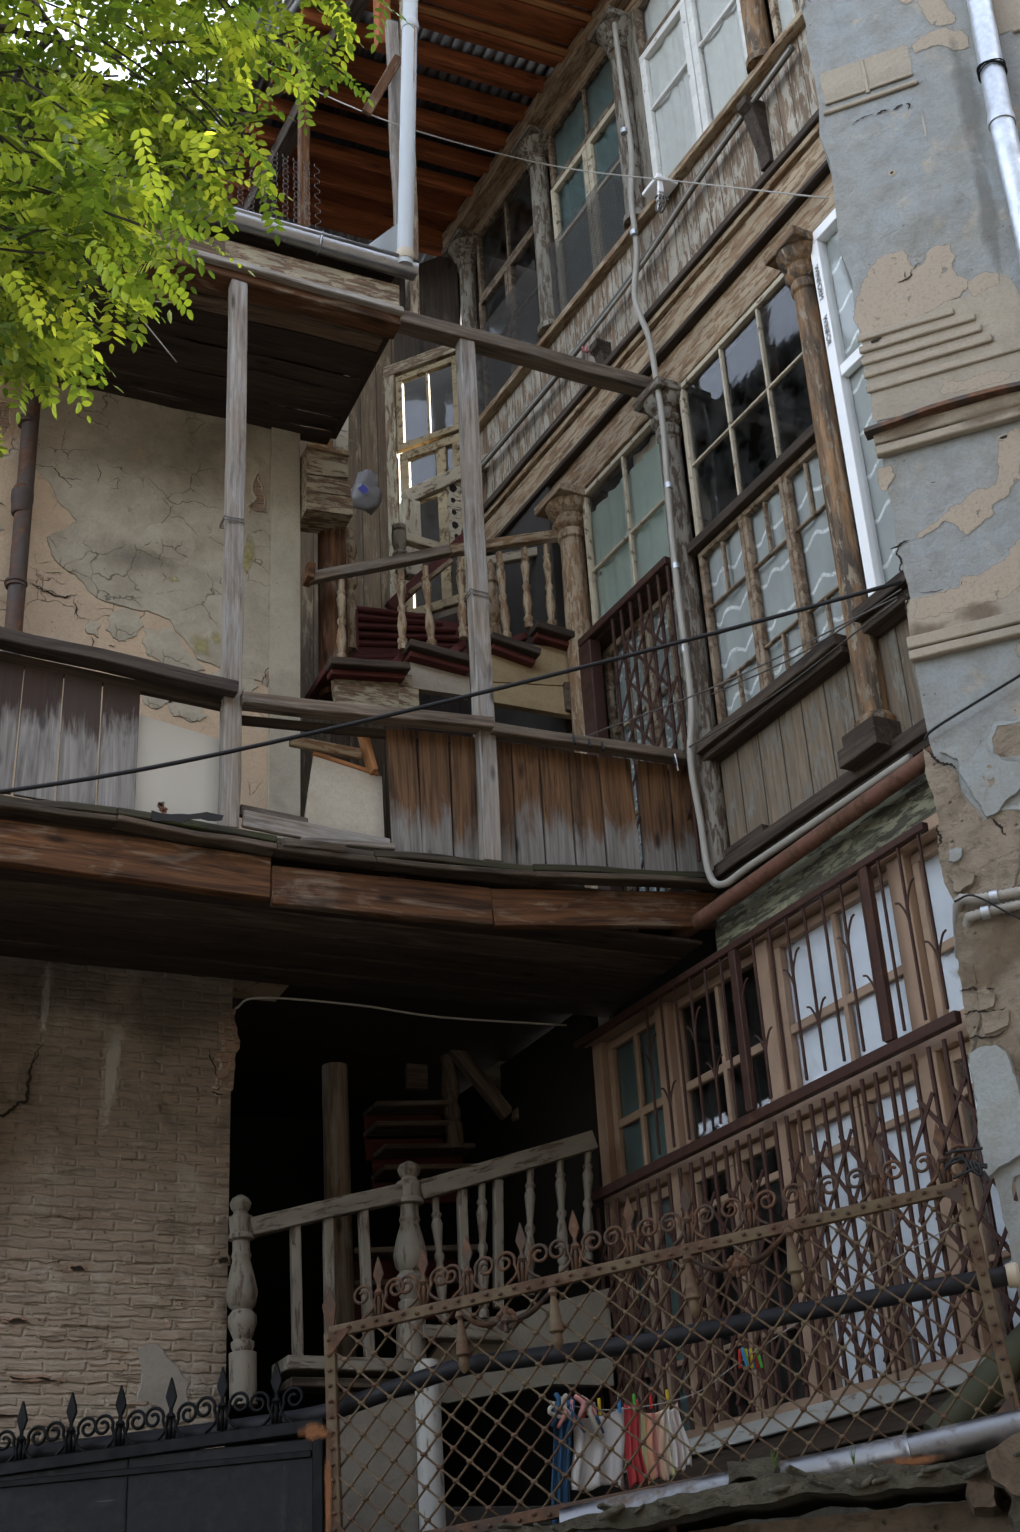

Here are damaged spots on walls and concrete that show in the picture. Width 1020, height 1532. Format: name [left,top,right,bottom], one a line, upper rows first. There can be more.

peeling [900,0,970,53]
peeling [853,244,969,343]
peeling [940,370,1019,394]
spalling [0,398,16,442]
crack [36,464,219,536]
crack [30,572,115,647]
peeling [914,539,1020,620]
spalling [923,718,1020,1300]
crack [0,1043,44,1118]